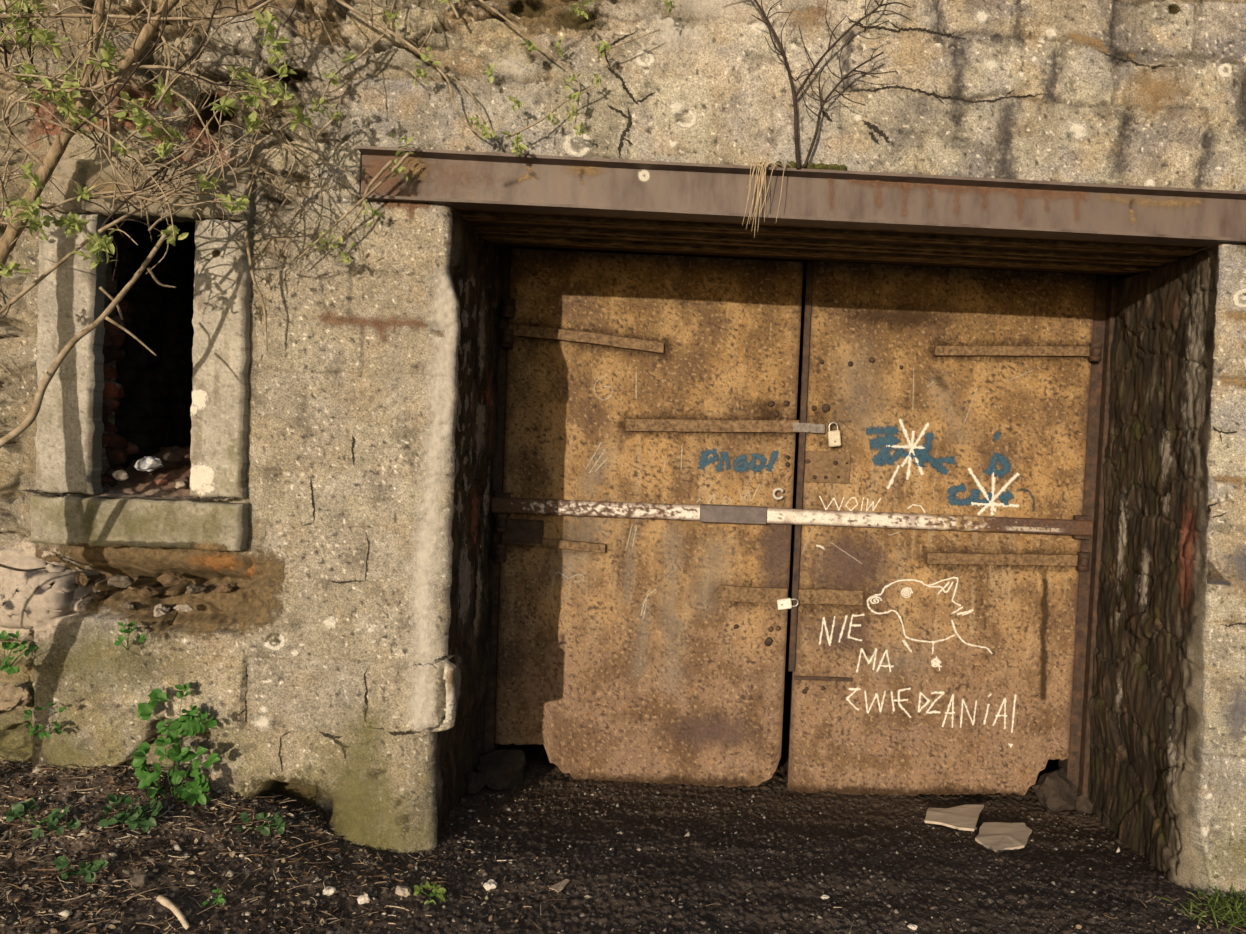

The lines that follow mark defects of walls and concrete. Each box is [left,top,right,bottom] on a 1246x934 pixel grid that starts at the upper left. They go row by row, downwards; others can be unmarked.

crack [844,85,1048,104]
rust [365,157,429,218]
rust [850,179,1200,223]
rust [508,321,670,357]
rust [929,339,1090,363]
rust [617,400,796,439]
rust [743,523,789,588]
rust [811,538,892,590]
spalling [35,543,285,640]
rust [817,618,865,648]
rust [922,547,1077,700]
spalling [240,771,316,805]